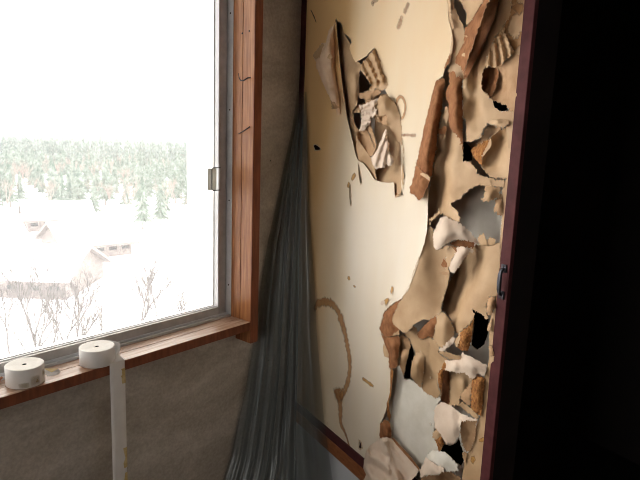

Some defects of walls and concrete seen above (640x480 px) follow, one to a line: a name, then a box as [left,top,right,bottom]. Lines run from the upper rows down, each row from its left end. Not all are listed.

damp [314,298,352,446]